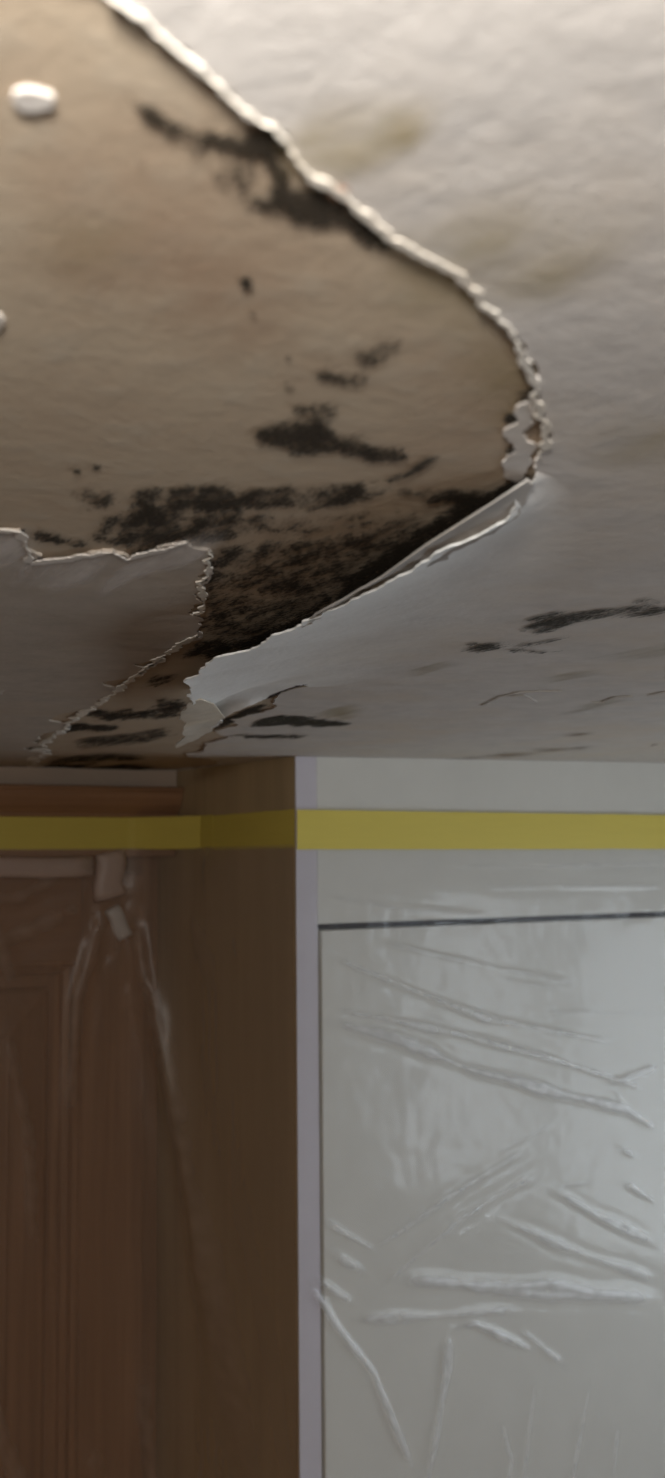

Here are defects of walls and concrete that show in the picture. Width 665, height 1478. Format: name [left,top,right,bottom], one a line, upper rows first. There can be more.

leakage [128,95,397,253]
leakage [239,276,253,290]
peeling [0,0,584,770]
leakage [0,340,535,770]
leakage [467,599,665,654]